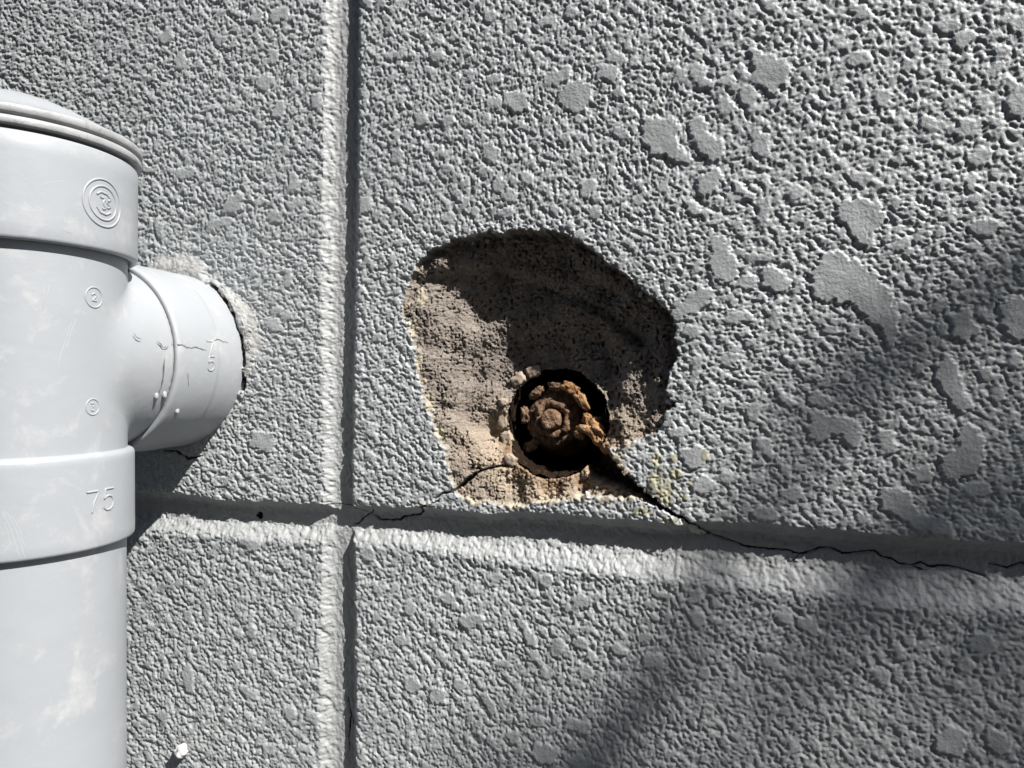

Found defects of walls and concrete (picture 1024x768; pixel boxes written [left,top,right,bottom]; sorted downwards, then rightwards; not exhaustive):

spalling [402,228,707,534]
crack [328,464,509,524]
rust [504,427,608,490]
crack [589,453,1022,574]